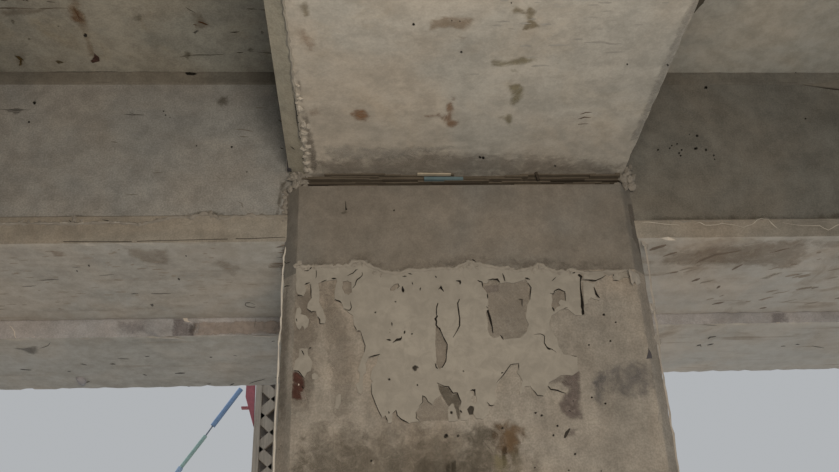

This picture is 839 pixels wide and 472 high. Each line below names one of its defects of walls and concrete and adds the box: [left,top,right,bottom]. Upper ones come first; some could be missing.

corrosion [292,372,306,399]
peeling [253,247,618,472]